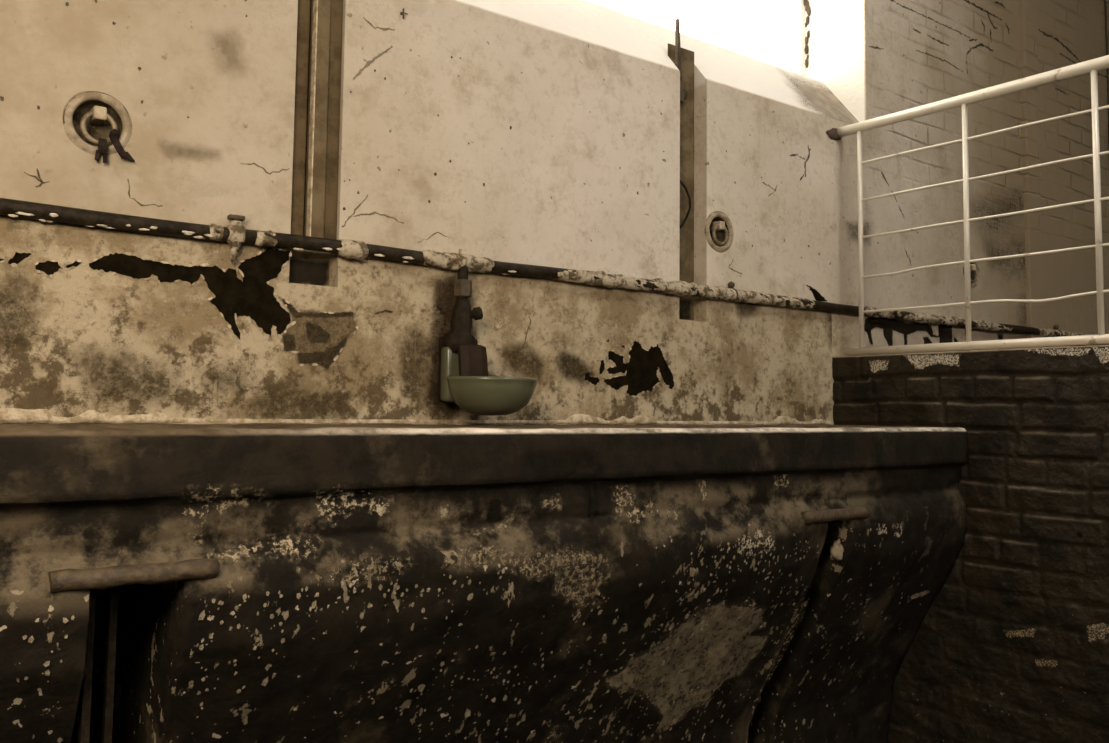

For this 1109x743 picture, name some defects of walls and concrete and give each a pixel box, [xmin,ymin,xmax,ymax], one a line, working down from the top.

crack [353,17,395,80]
crack [891,0,1009,74]
crack [762,146,810,196]
crack [342,195,447,242]
water stain [0,282,30,347]
peeling [0,248,359,368]
water stain [864,306,1013,354]
water stain [82,357,171,397]
water stain [253,390,346,415]
peeling [585,339,675,398]
peeling [253,591,289,686]
spalling [606,530,818,743]